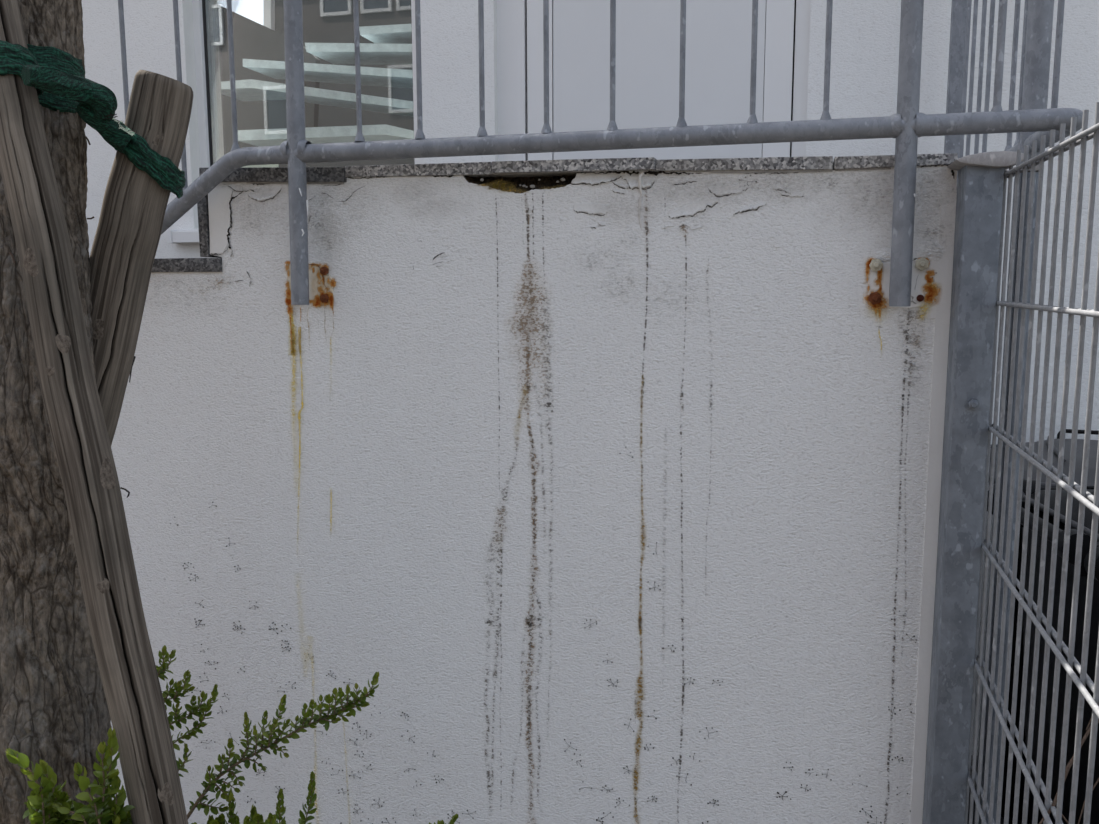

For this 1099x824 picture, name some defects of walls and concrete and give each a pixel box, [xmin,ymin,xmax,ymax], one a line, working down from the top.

crack [209,183,264,286]
rust [285,261,336,478]
spalling [464,174,655,194]
water stain [638,171,648,407]
peeling [662,180,749,231]
rust [864,258,887,350]
water stain [899,312,922,465]
rust [911,258,940,317]
water stain [484,194,552,823]
water stain [634,423,645,823]
water stain [884,479,907,822]